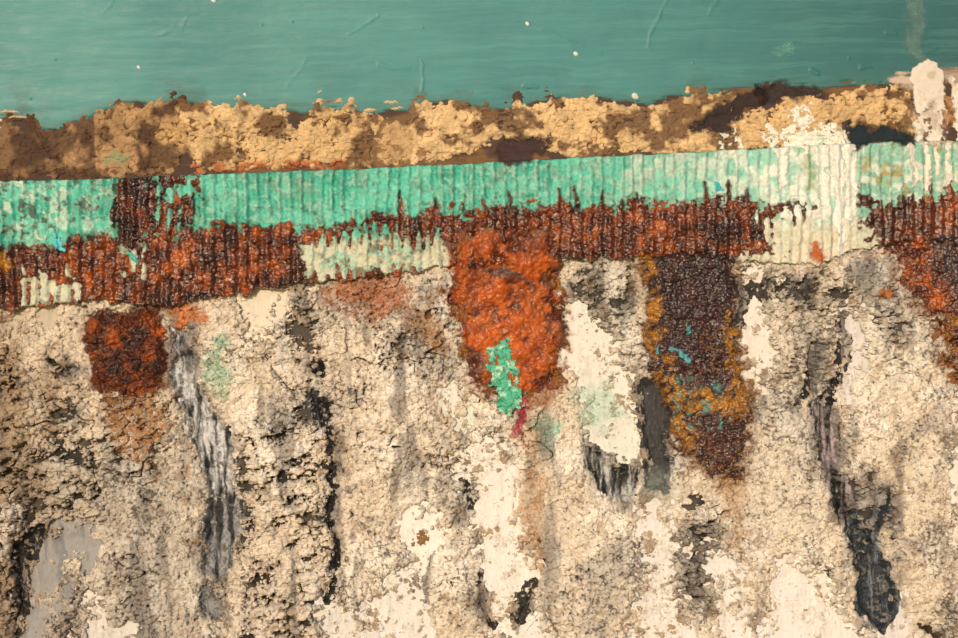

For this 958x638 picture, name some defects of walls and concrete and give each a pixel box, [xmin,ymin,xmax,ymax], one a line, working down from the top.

rust [0,174,818,521]
flaking render [556,298,649,467]
rust [810,241,824,262]
rust [856,178,958,393]
flaking render [8,510,142,638]
flaking render [312,354,572,638]
flaking render [626,494,920,638]
flaking render [938,388,958,613]